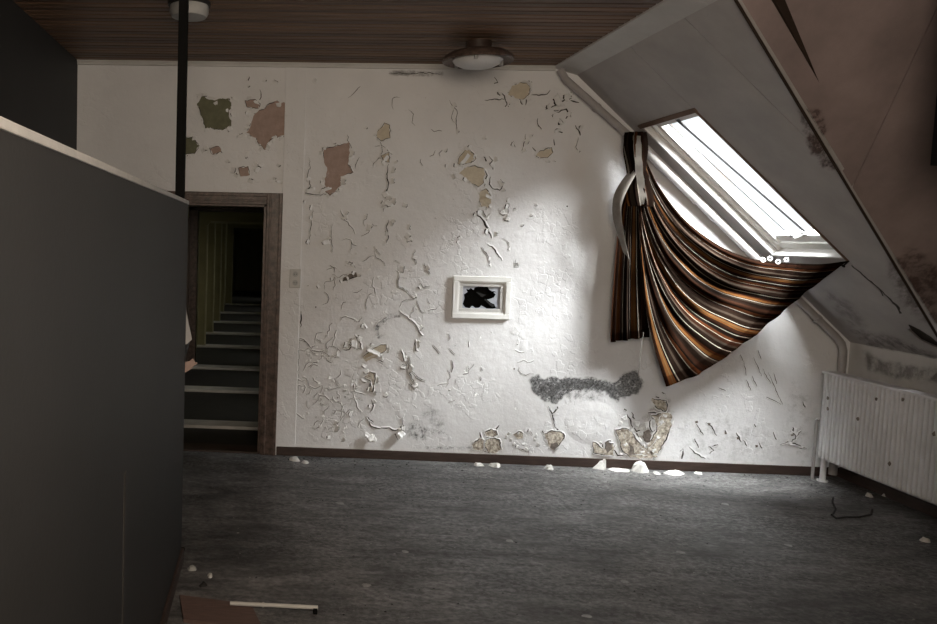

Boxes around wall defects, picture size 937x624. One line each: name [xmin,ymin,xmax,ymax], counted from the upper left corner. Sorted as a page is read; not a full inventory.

peeling [186,75,288,184]
peeling [419,145,517,221]
peeling [296,122,408,442]
spalling [463,286,496,309]
peeling [391,291,438,390]
peeling [432,333,483,404]
spalling [471,406,566,468]